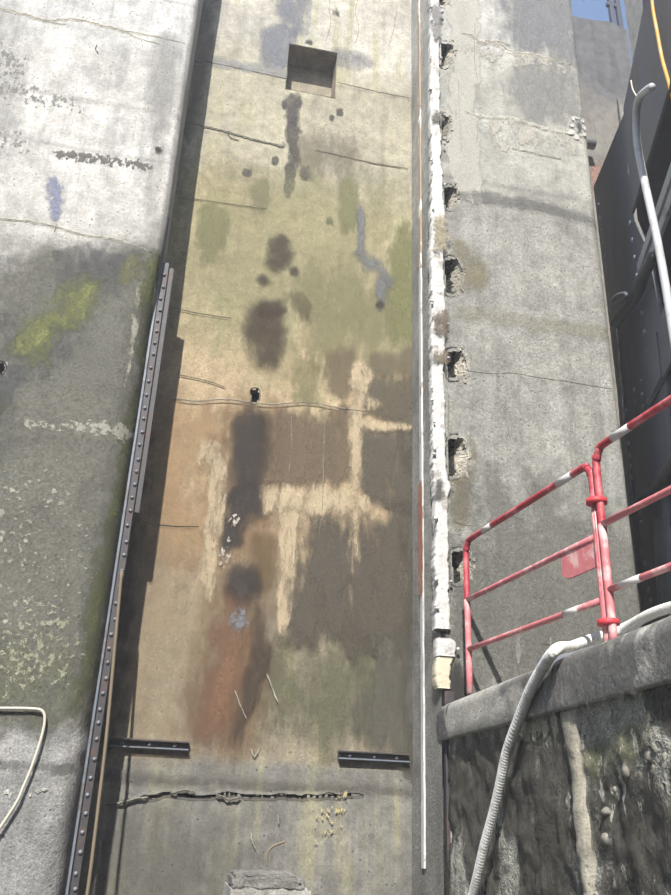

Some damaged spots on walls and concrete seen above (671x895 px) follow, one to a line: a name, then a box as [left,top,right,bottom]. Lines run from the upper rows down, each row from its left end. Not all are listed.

crack [0,8,185,54]
crack [198,60,287,79]
spalling [429,39,458,70]
water stain [271,93,311,198]
crack [0,218,154,254]
spalling [443,254,466,298]
spalling [432,433,472,485]
water stain [0,246,160,727]
water stain [159,347,413,776]
spalling [447,546,476,589]
crack [106,788,364,807]
water stain [485,825,500,895]